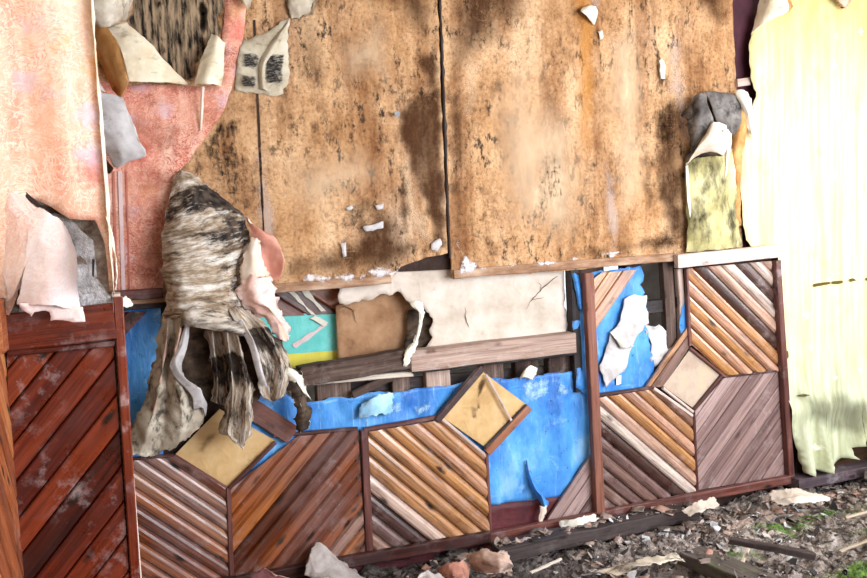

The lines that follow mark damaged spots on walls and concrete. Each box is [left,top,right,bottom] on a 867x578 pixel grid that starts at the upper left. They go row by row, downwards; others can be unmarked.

water stain [465,0,514,43]
peeling [751,0,789,33]
peeling [94,0,225,174]
water stain [383,55,445,246]
water stain [651,104,682,248]
peeling [2,192,118,322]
peeling [403,309,425,367]
peeling [610,332,634,348]